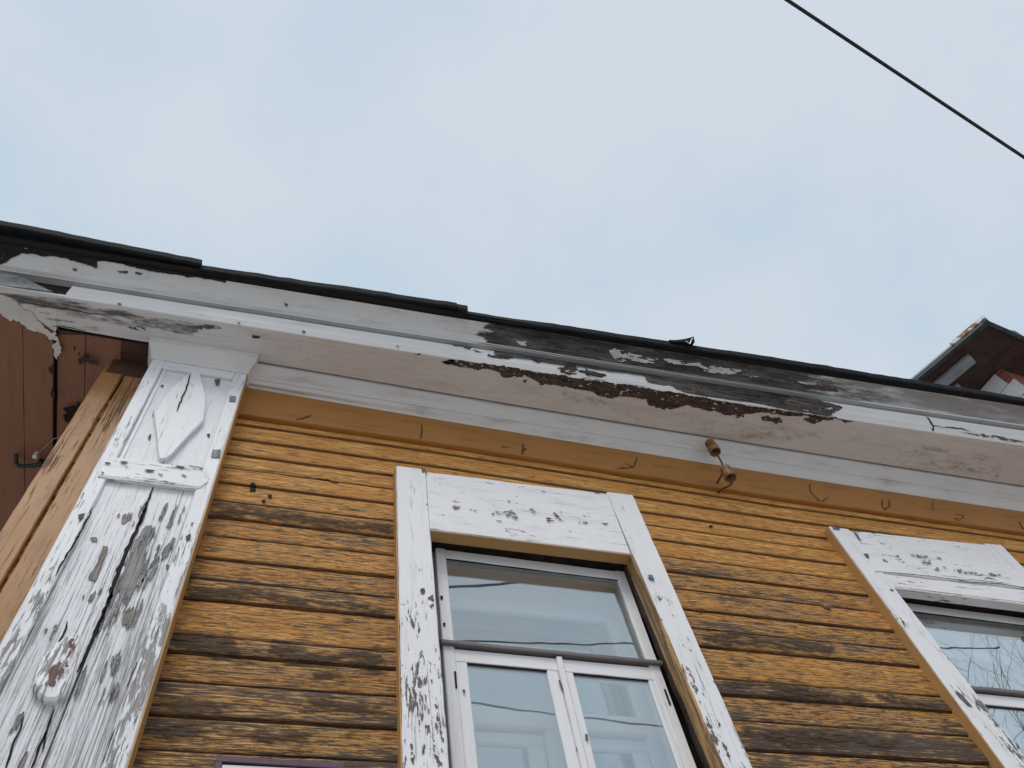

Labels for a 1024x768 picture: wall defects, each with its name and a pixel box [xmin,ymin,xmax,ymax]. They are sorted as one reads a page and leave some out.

peeling [0,294,99,375]
crack [177,373,191,410]
peeling [442,344,853,424]
leakage [476,323,890,404]
crack [927,417,974,432]
peeling [492,501,563,522]
crack [77,489,153,672]
peeling [82,503,191,635]
peeling [45,638,87,700]
peeling [98,650,121,705]
peeling [410,704,444,766]